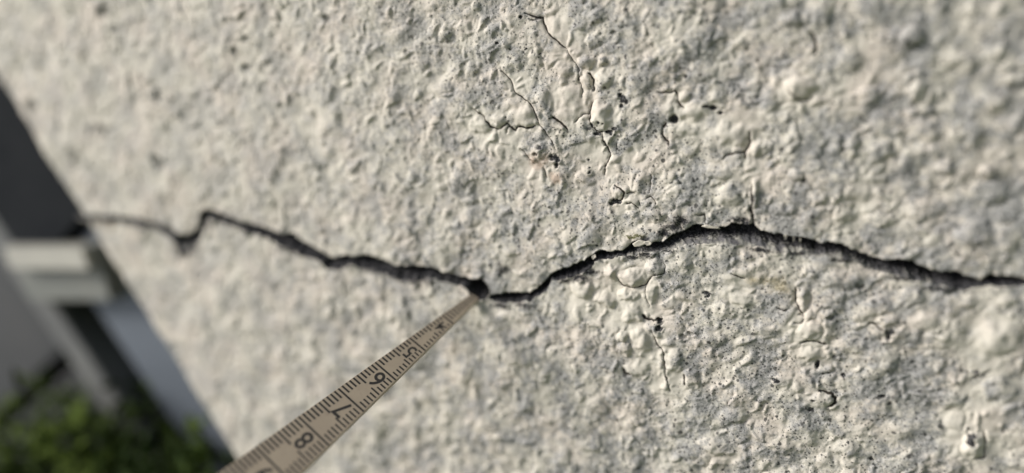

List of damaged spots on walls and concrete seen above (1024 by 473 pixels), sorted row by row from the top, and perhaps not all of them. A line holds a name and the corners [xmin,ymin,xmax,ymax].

crack [76,13,1024,392]